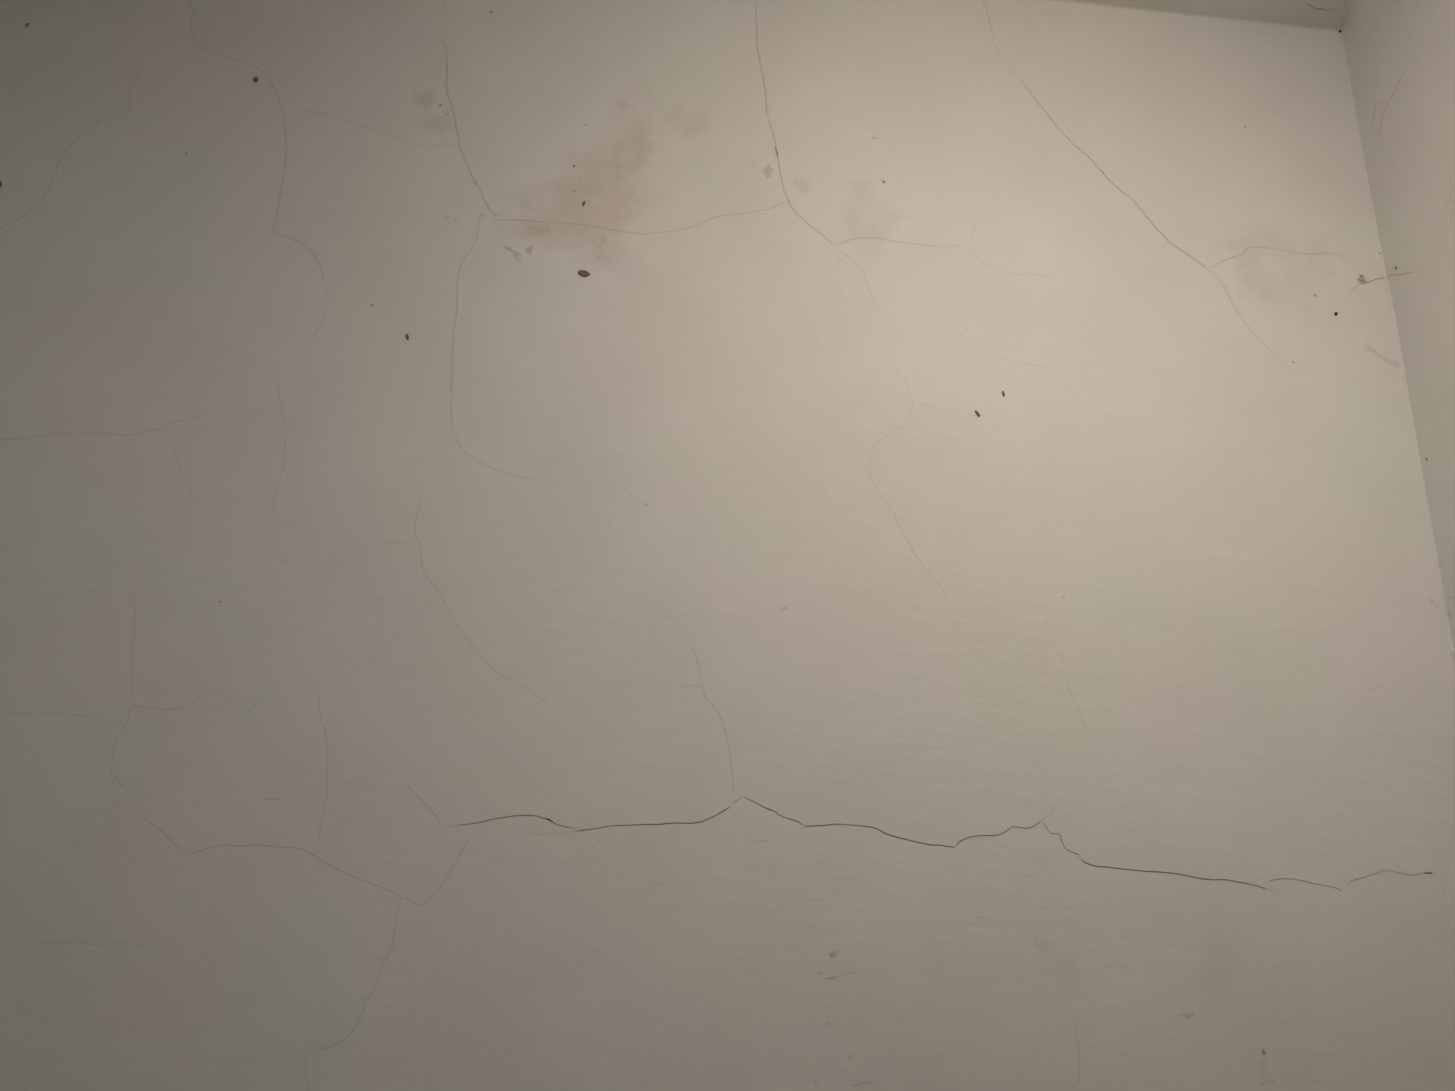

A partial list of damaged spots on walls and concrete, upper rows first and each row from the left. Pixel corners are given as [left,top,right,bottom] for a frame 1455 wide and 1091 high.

crack [479,797,1321,889]